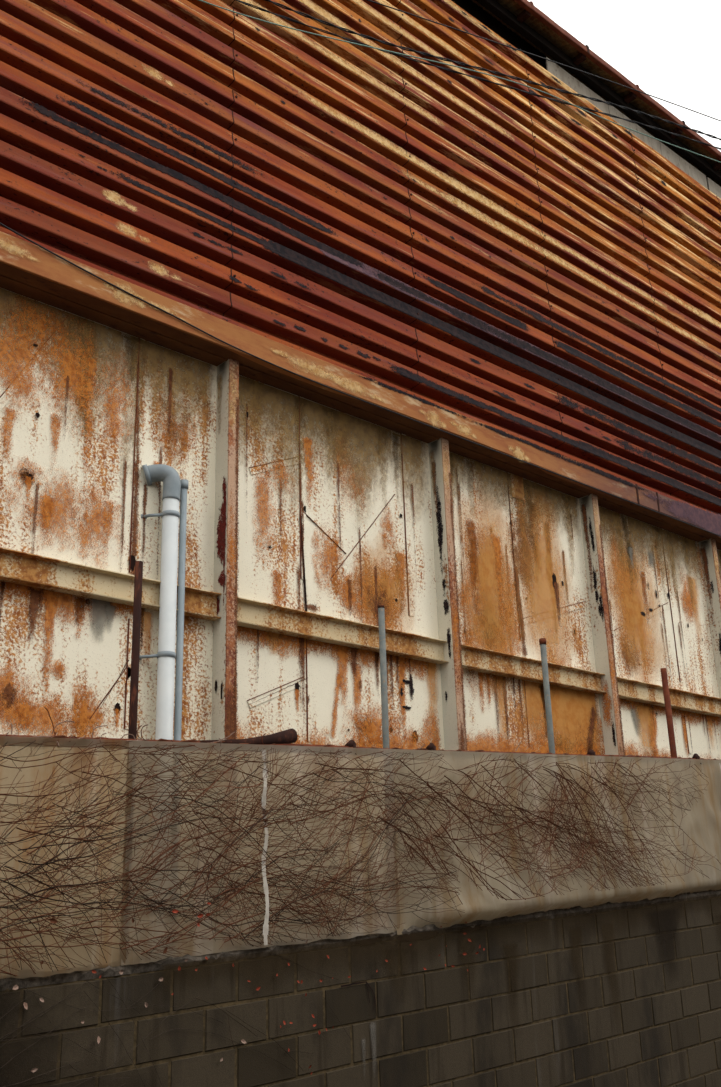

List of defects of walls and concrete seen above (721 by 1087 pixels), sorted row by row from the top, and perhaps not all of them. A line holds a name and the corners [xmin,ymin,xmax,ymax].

rust [0,293,161,576]
rust [153,368,196,464]
rust [0,581,114,737]
rust [110,602,151,651]
rust [225,380,441,750]
rust [443,461,605,755]
rust [594,502,721,760]